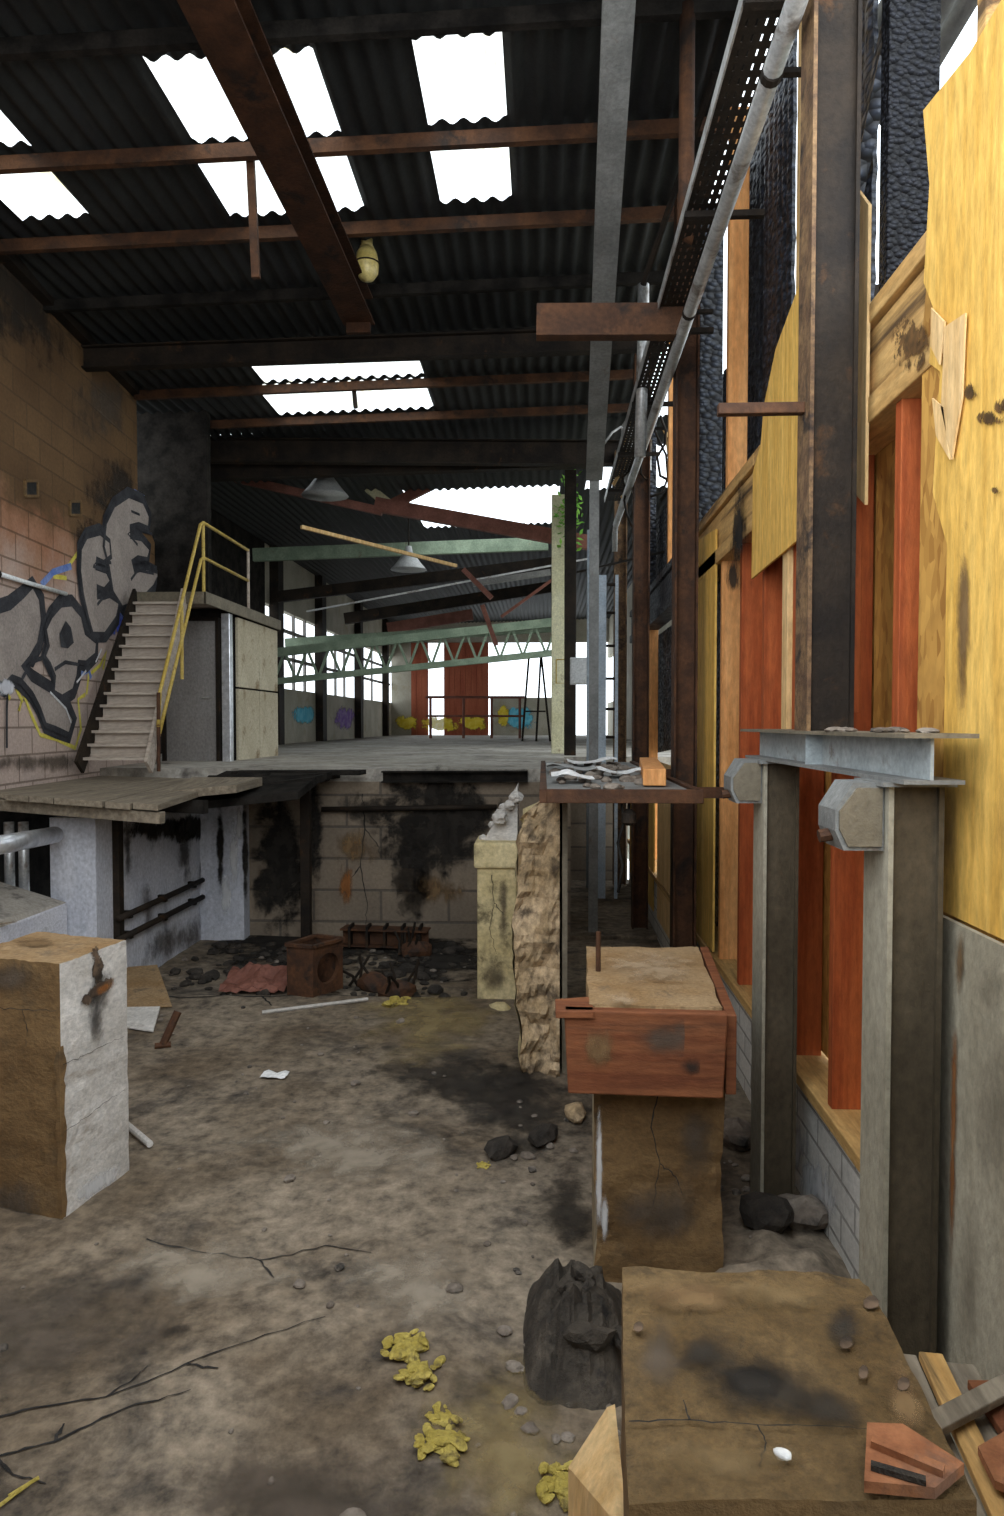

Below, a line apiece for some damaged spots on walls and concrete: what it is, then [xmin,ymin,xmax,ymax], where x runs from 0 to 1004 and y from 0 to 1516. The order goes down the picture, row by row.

damp [144,898,199,955]
crack [146,1238,372,1278]
crack [0,1316,325,1484]